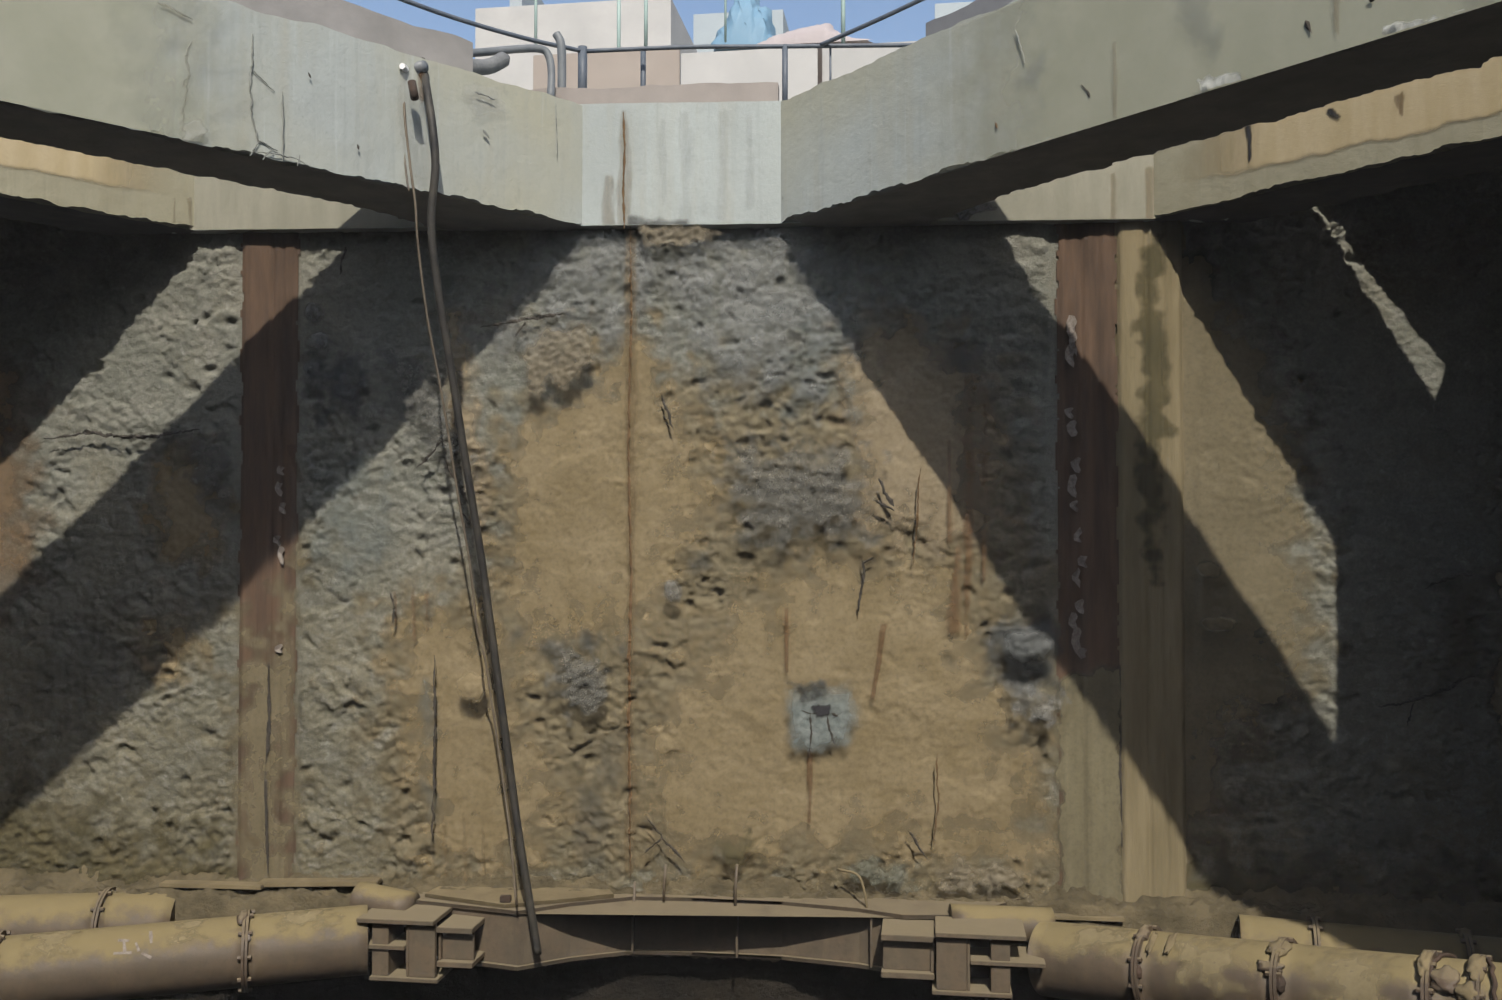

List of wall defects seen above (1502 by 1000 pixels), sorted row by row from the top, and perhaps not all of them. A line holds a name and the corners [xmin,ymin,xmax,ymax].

spalling [789,680,856,755]